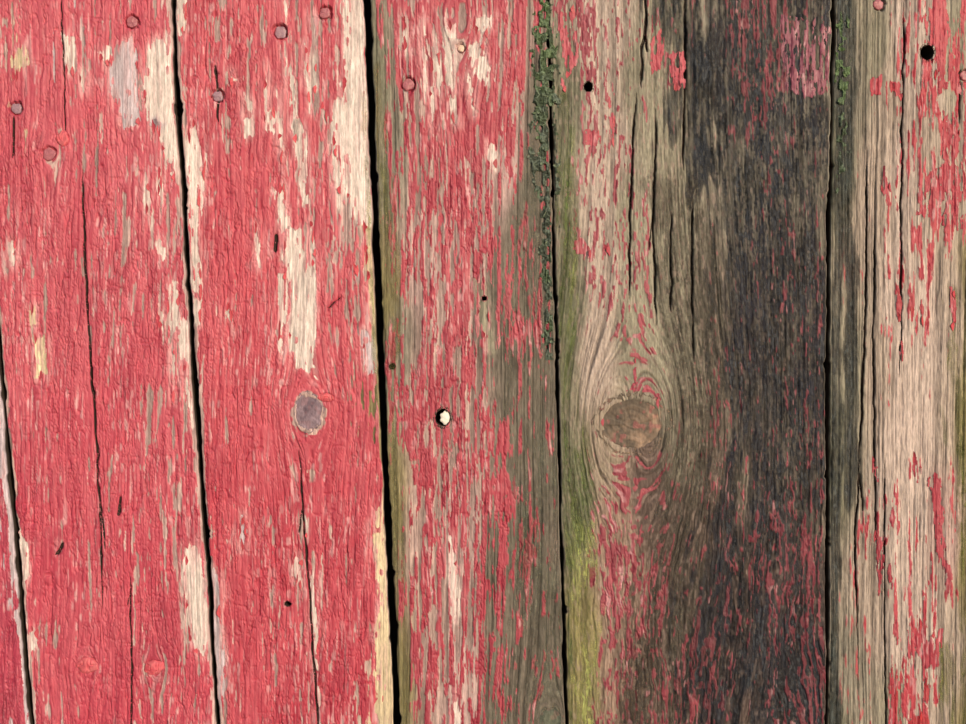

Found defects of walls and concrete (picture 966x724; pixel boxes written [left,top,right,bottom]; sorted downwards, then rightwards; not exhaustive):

peeling [177,0,187,36]
peeling [467,15,492,116]
peeling [780,14,831,99]
peeling [99,36,207,426]
peeling [244,0,377,379]
crack [82,176,121,605]
peeling [19,531,30,581]
crack [126,570,134,724]
peeling [181,544,228,699]
peeling [291,552,321,724]
crack [298,450,319,724]
peeling [372,507,392,724]